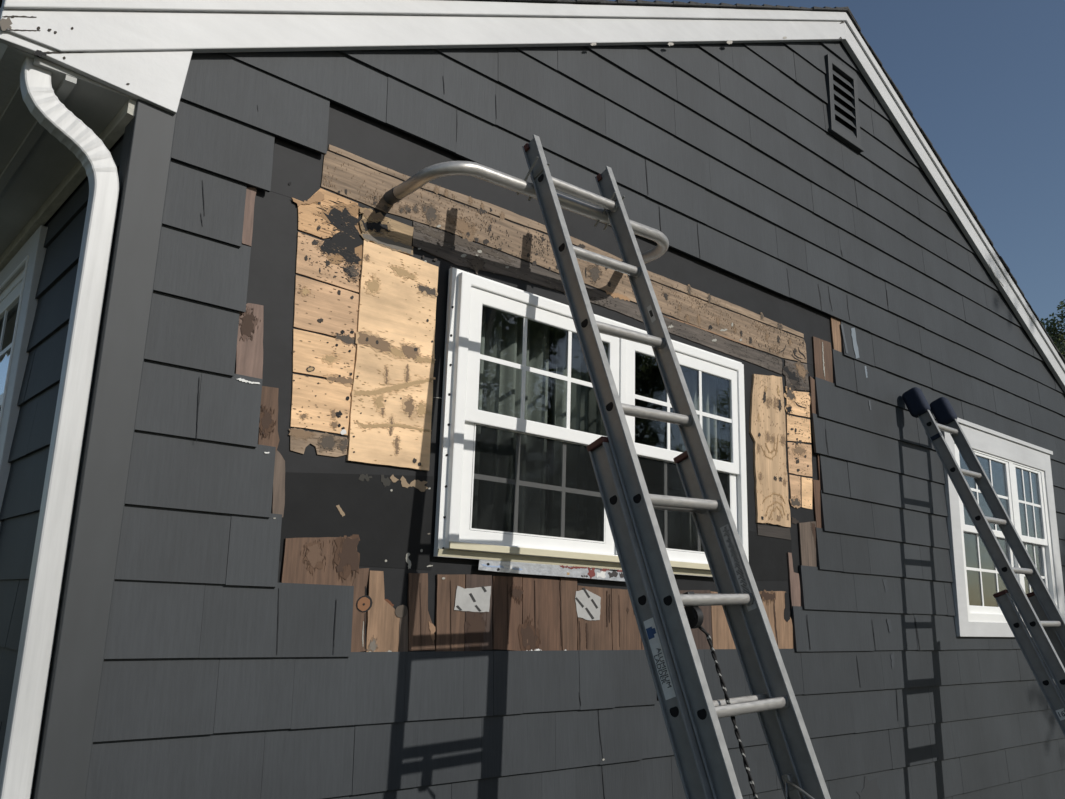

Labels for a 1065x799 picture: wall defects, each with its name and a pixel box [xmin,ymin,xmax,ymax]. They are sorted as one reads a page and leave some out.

peeling [292,191,324,206]
water stain [289,148,563,456]
peeling [359,474,431,492]
peeling [567,570,624,578]